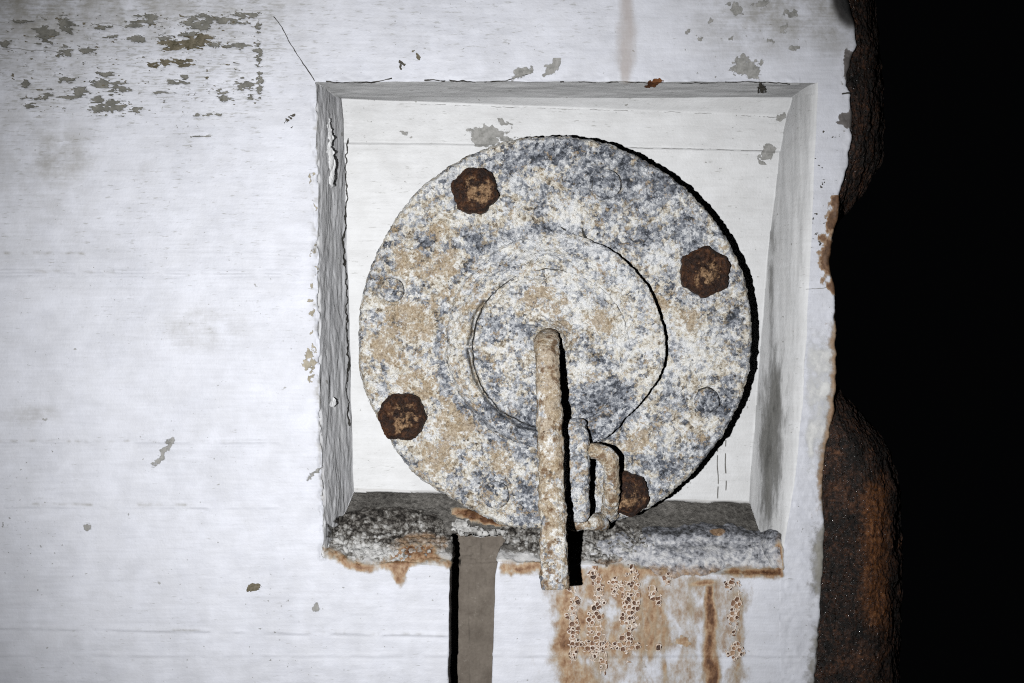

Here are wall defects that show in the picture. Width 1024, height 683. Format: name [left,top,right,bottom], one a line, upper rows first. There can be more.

peeling [0,9,264,117]
crack [273,16,392,83]
spalling [729,53,763,79]
spalling [727,0,769,16]
spalling [767,9,798,43]
peeling [843,49,854,81]
rust [816,195,840,295]
crack [342,138,351,426]
spalling [302,330,318,382]
rust [817,319,837,504]
rust [324,543,452,584]
rust [550,542,784,683]